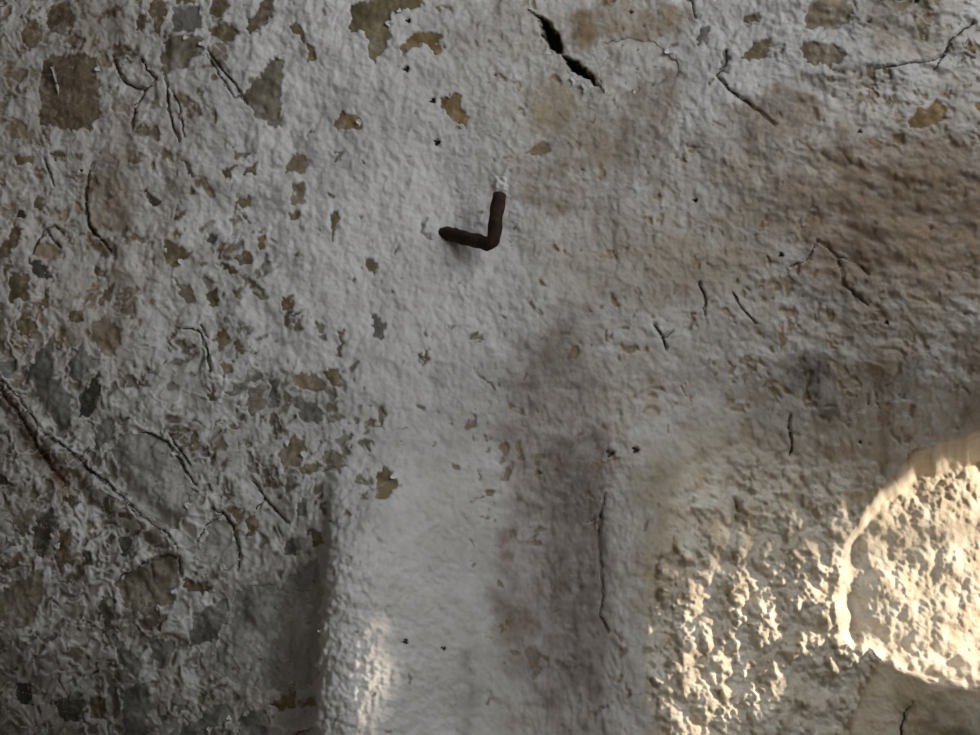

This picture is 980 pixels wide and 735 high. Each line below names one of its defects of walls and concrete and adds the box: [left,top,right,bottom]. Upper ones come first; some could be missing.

peeling [136,0,273,75]
peeling [349,0,445,63]
crack [527,9,605,94]
peeling [38,53,101,132]
peeling [243,54,285,128]
peeling [286,153,307,220]
peeling [0,195,44,259]
peeling [0,258,122,431]
crack [183,324,211,370]
peeling [207,329,279,416]
crack [0,380,240,581]
crack [249,477,287,525]